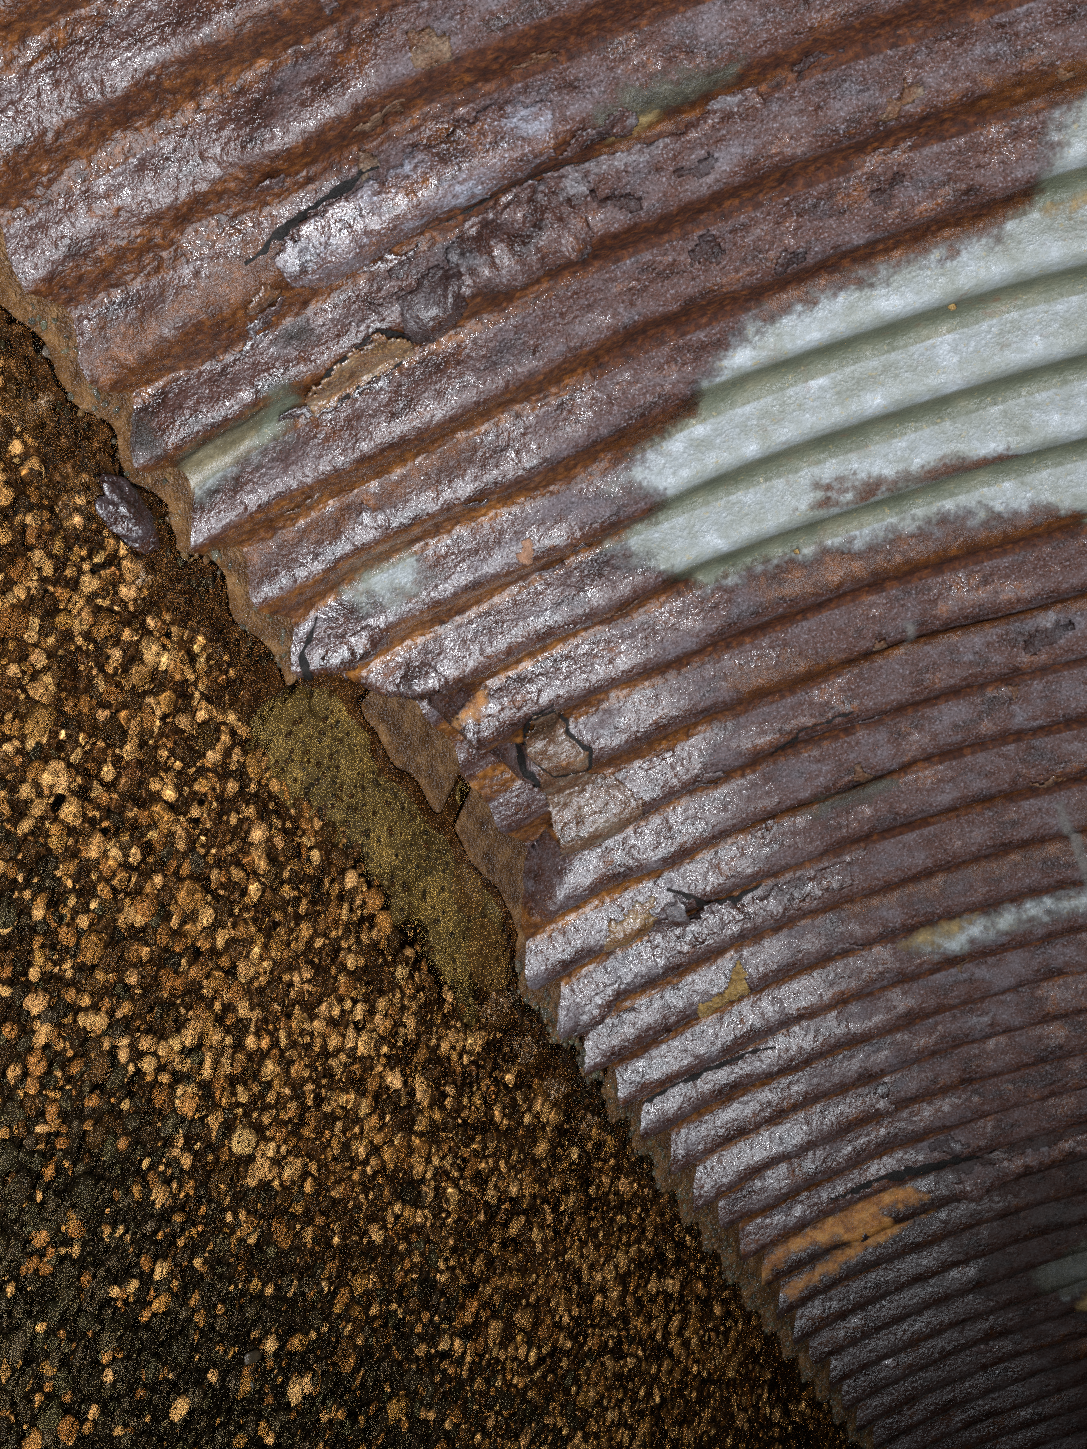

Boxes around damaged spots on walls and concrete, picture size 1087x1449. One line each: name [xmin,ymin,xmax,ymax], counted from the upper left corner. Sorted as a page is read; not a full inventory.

crack [244,165,380,266]
corrosion [811,453,1022,509]
corrosion [737,601,1087,700]
crack [514,705,554,788]
corrosion [603,895,658,953]
corrosion [647,894,751,975]
corrosion [841,884,918,916]
corrosion [920,872,948,898]
corrosion [1001,848,1030,864]
corrosion [572,974,622,1038]
corrosion [696,960,751,1018]
corrosion [762,1124,1087,1449]